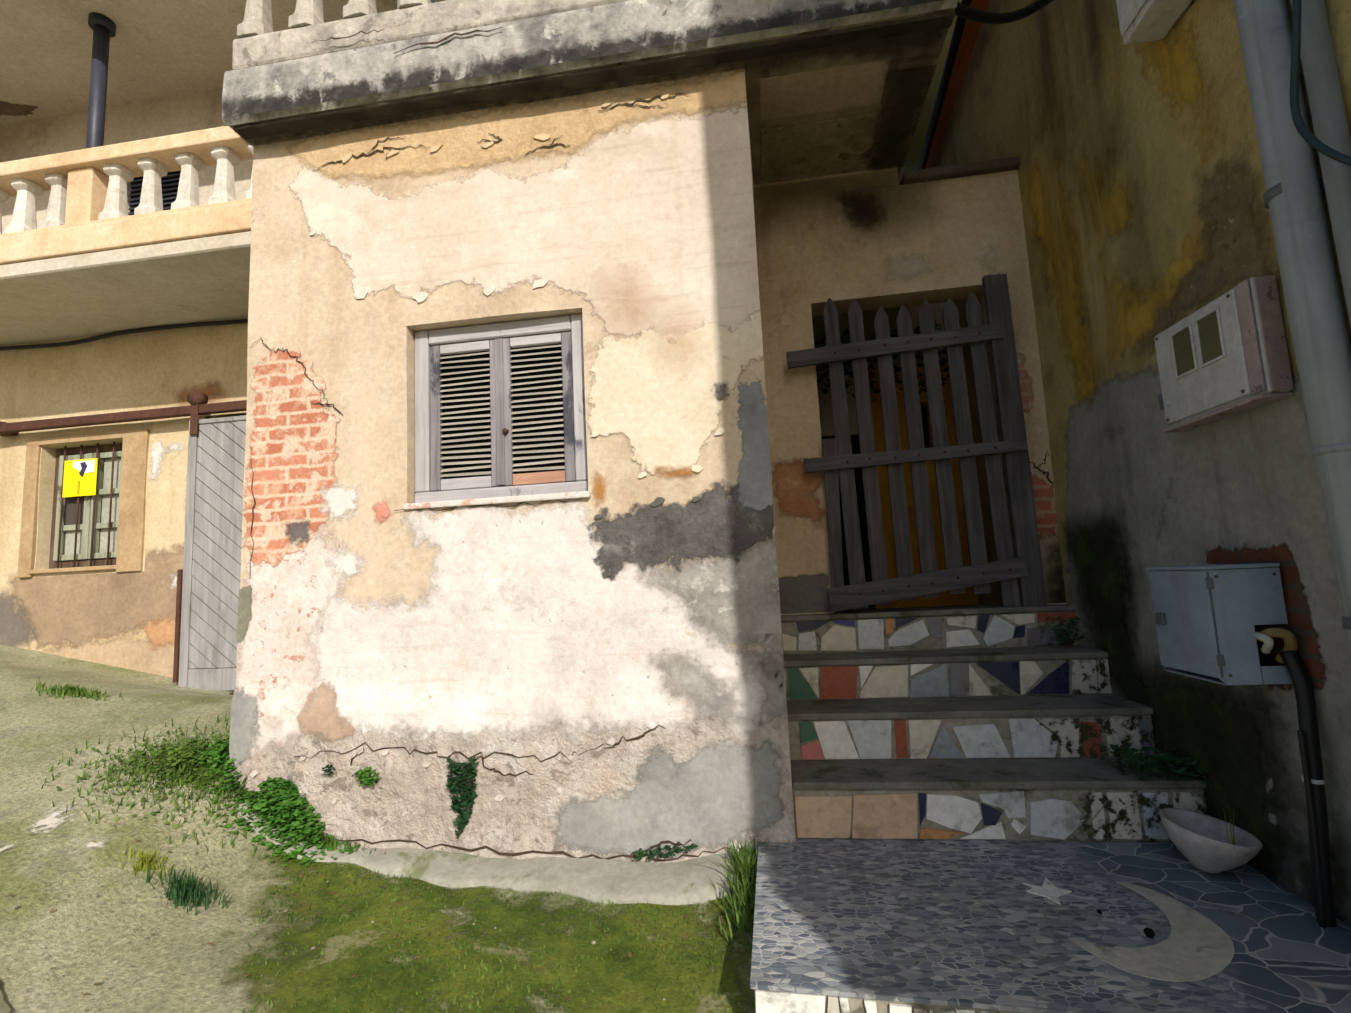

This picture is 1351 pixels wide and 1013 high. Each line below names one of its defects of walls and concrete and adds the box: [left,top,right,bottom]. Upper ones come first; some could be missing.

peeling [287,69,763,478]
peeling [230,348,796,863]